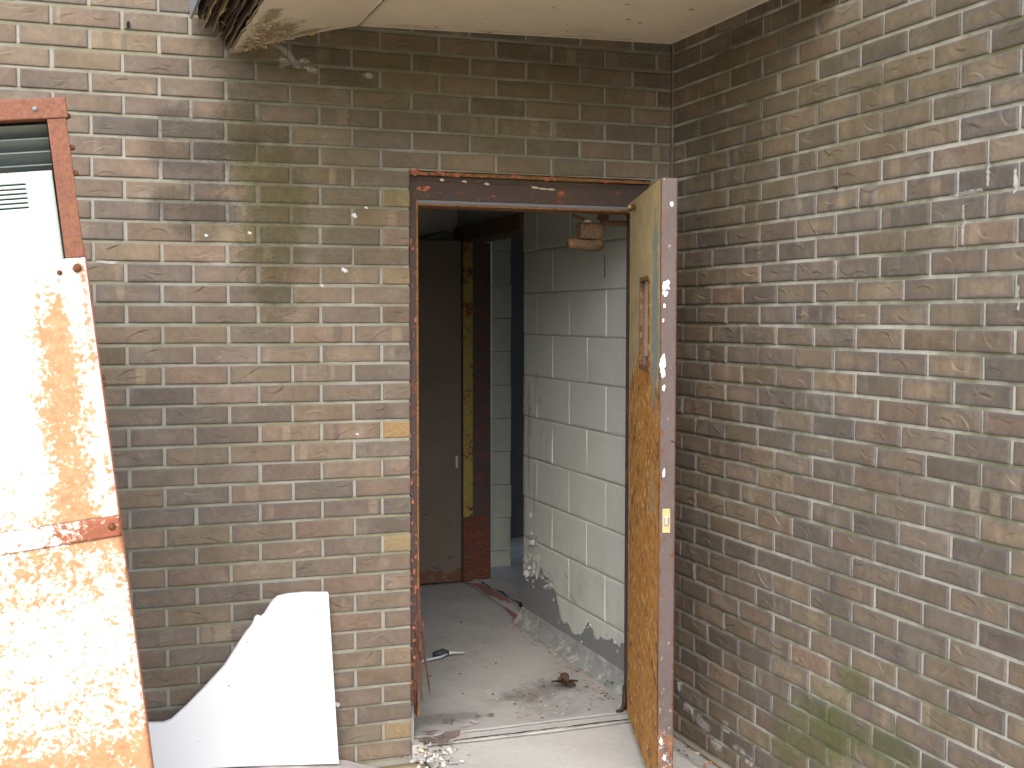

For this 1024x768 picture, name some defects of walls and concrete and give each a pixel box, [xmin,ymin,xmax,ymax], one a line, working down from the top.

rust [413,589,430,713]
peeling [523,512,624,671]